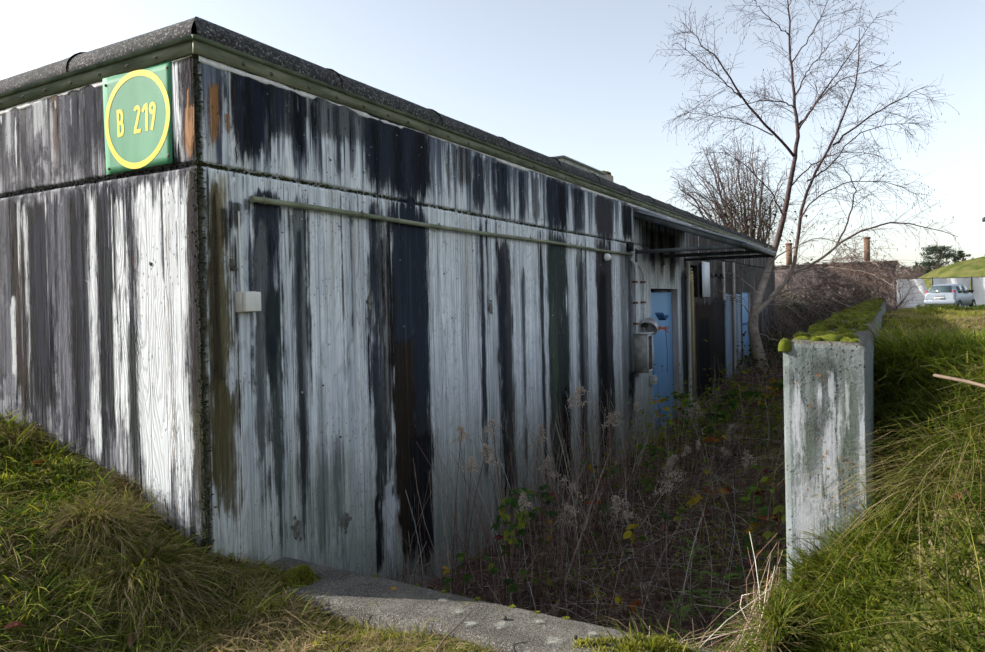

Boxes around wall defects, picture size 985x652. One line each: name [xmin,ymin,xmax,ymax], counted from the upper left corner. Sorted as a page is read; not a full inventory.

rust [179,57,196,157]
rust [209,84,230,144]
water stain [4,196,56,422]
water stain [65,80,140,487]
water stain [172,65,435,581]
water stain [470,155,635,520]
water stain [810,355,856,478]